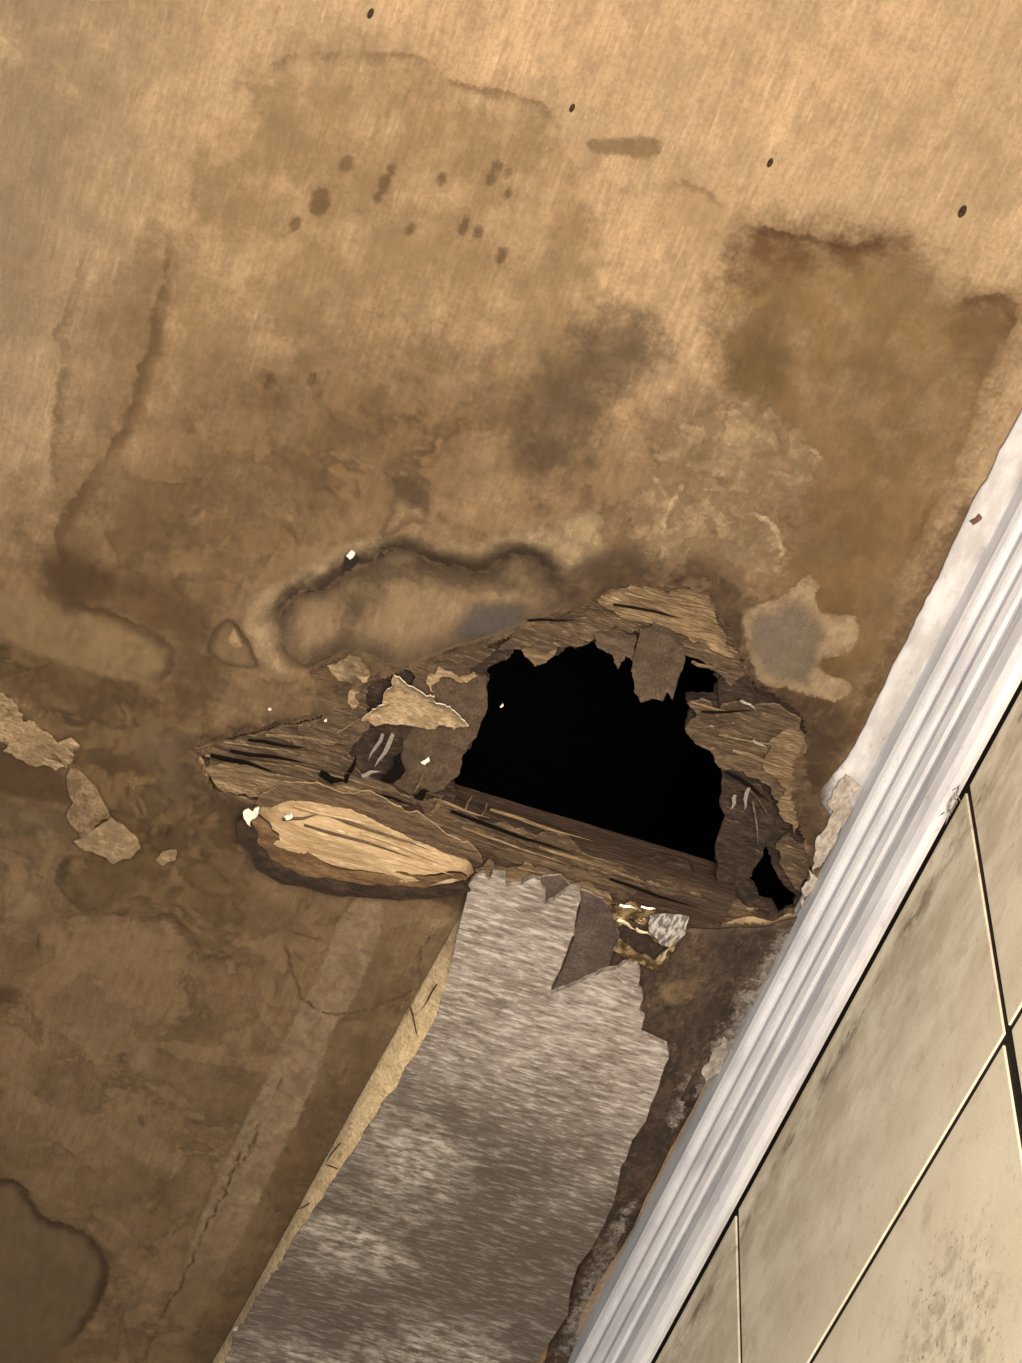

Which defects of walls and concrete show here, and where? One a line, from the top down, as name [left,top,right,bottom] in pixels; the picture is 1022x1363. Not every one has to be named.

leakage [290,189,329,229]
leakage [587,138,660,156]
leakage [468,314,654,478]
leakage [724,233,1017,678]
spalling [206,462,602,730]
peeling [0,692,141,864]
peeling [155,849,177,866]
peeling [243,807,259,826]
leakage [0,383,817,1363]
leakage [768,686,866,877]
spalling [212,906,464,1363]